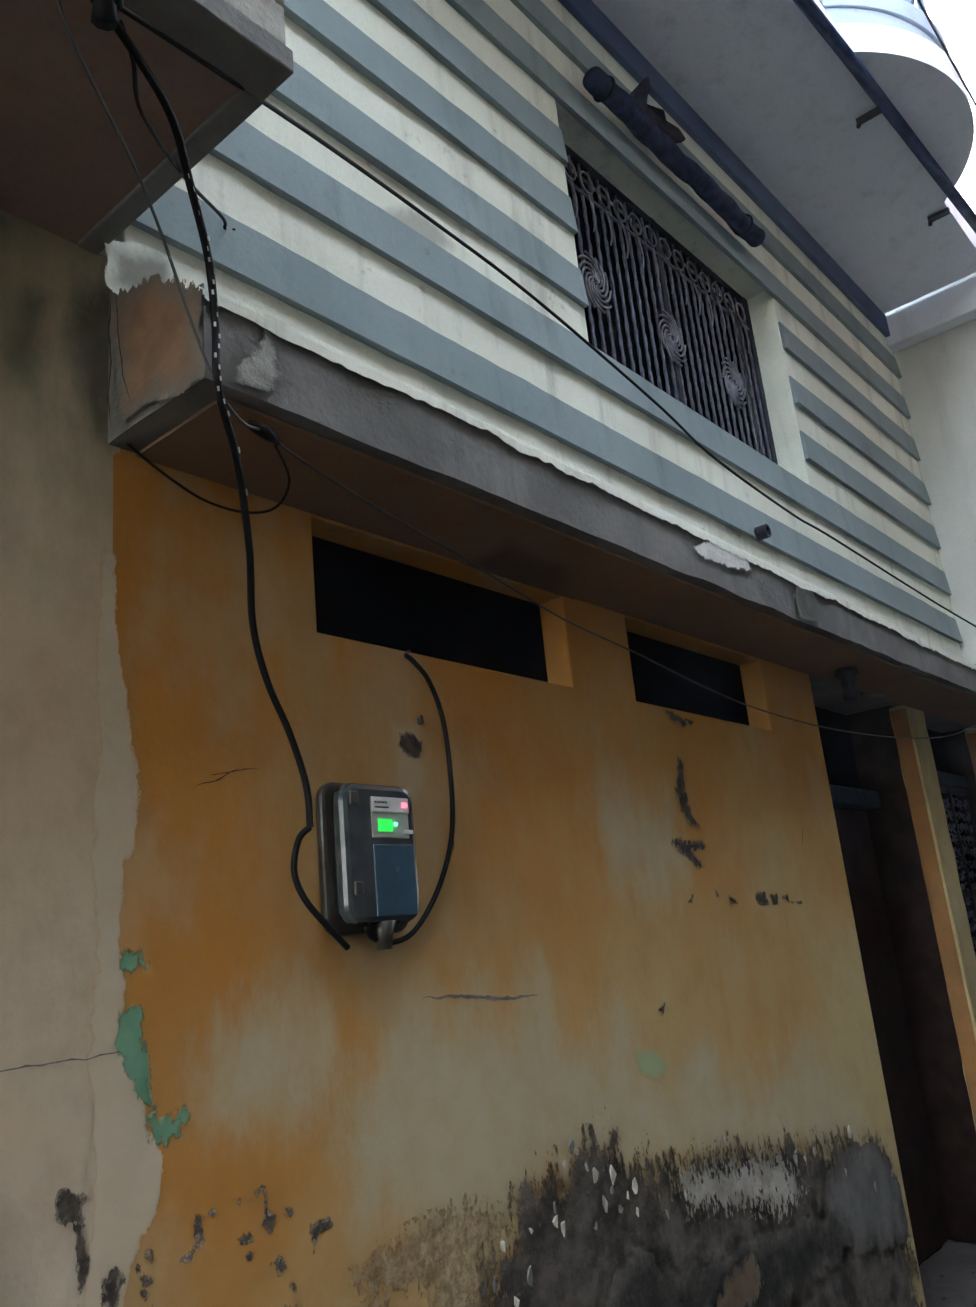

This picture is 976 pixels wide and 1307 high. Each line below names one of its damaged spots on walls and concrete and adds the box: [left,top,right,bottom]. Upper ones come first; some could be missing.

peeling [198,283,976,670]
spalling [671,758,706,869]
spalling [756,892,802,905]
peeling [120,949,149,973]
crack [0,1045,144,1072]
peeling [114,1005,190,1147]
flaking render [55,1188,153,1307]
peeling [180,1208,217,1263]
peeling [237,1184,294,1261]
peeling [270,1255,297,1307]
peeling [310,1216,333,1253]
leakage [467,1104,924,1307]